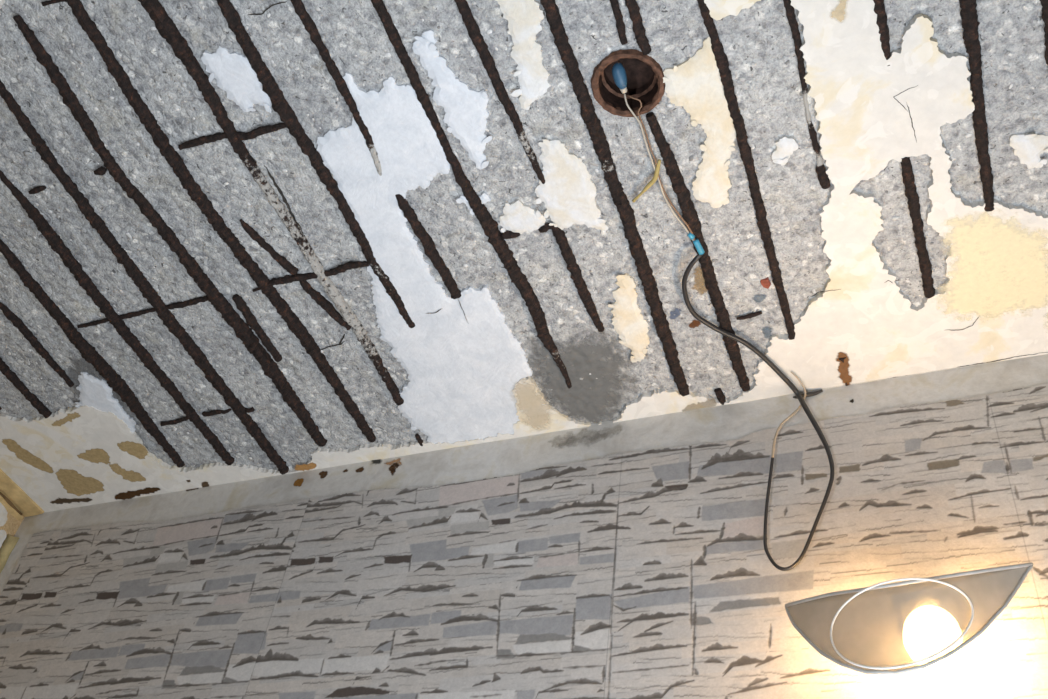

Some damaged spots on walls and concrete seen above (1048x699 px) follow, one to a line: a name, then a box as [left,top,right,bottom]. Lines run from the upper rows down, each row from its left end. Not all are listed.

peeling [832,0,846,21]
spalling [873,0,1048,215]
spalling [0,0,833,482]
spalling [853,154,951,307]
corrosion [692,266,707,294]
damp [528,335,634,423]
corrosion [836,352,852,385]
peeling [2,439,104,496]
corrosion [294,463,328,487]
corrosion [385,458,401,475]
corrosion [115,487,160,500]